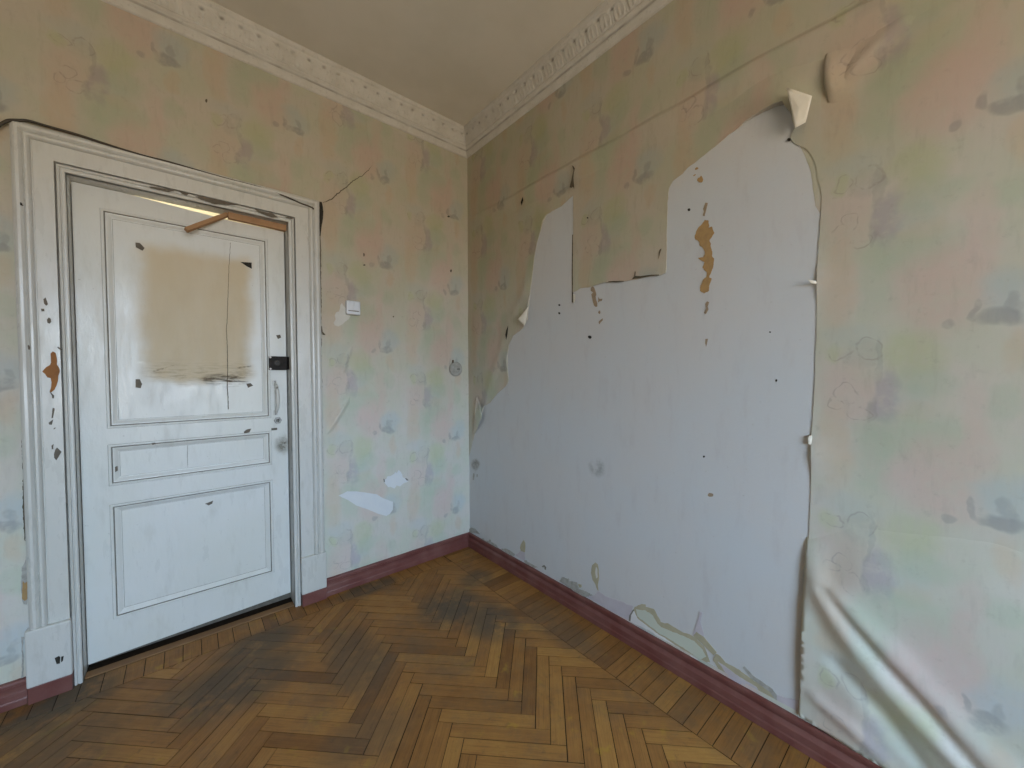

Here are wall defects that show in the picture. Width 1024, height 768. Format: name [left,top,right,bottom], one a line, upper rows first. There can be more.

crack [323,167,371,203]
peeling [42,347,62,429]
peeling [469,88,822,712]